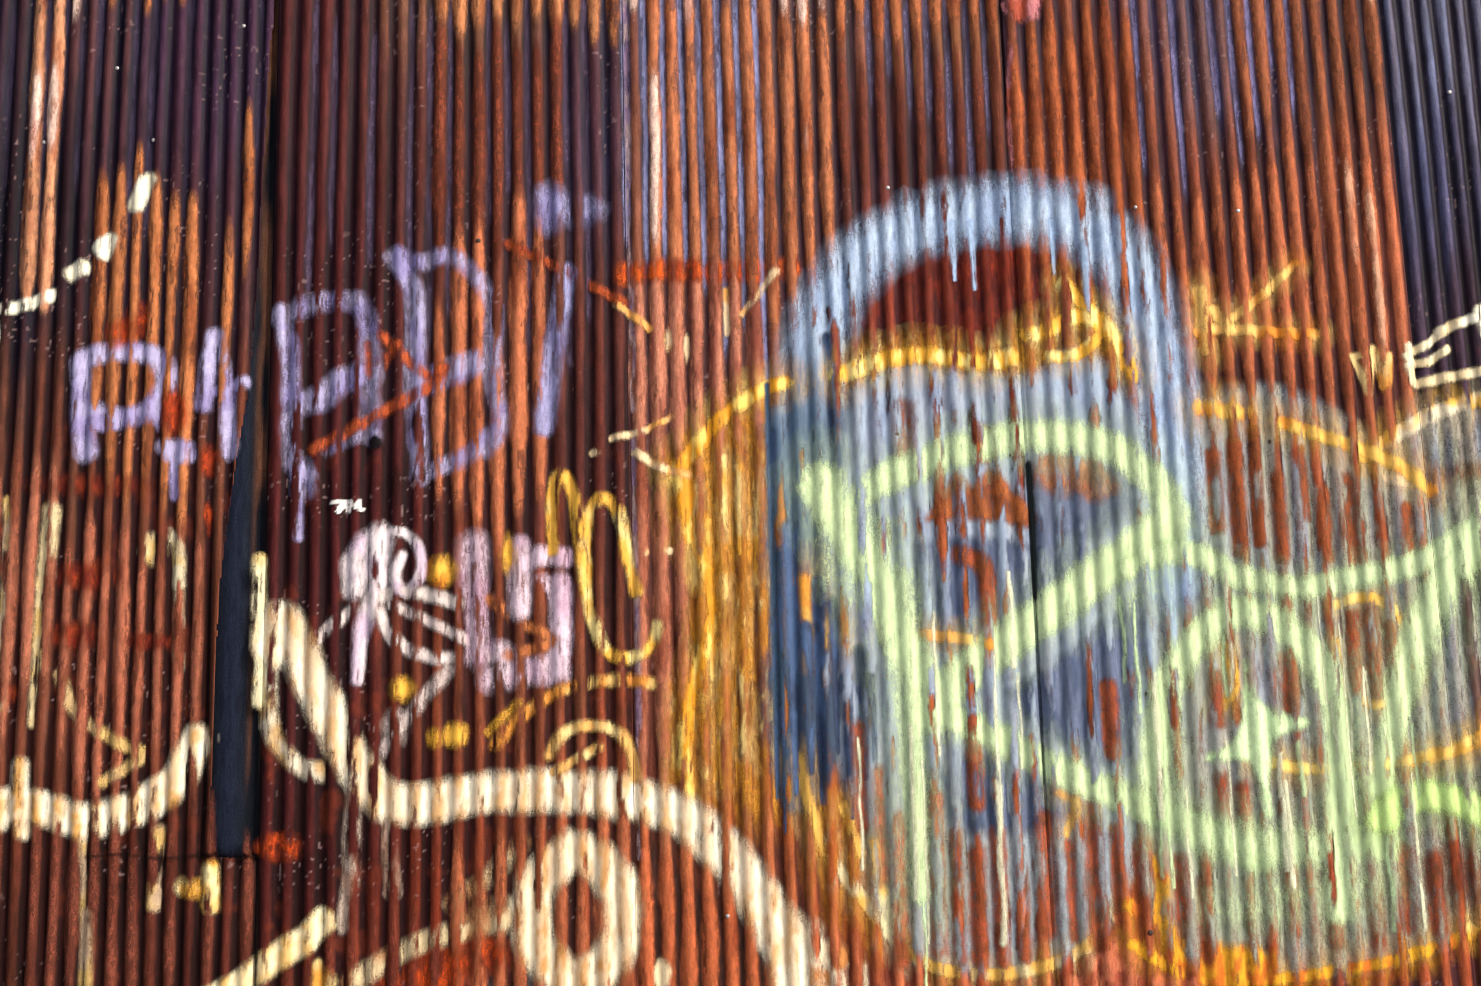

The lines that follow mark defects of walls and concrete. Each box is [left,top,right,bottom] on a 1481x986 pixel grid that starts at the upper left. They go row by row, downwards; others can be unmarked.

corrosion [20,0,78,311]
corrosion [218,105,254,408]
corrosion [309,0,1389,784]
corrosion [0,149,218,986]
corrosion [239,833,300,970]
corrosion [281,813,775,986]
corrosion [1060,934,1251,986]